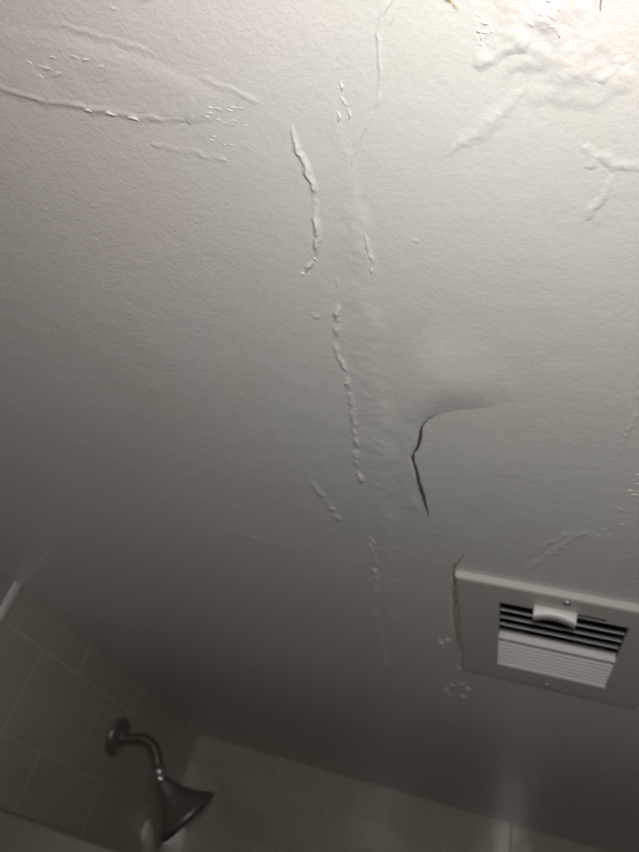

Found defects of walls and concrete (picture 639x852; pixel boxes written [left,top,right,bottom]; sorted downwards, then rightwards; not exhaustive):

crack [411,415,445,534]